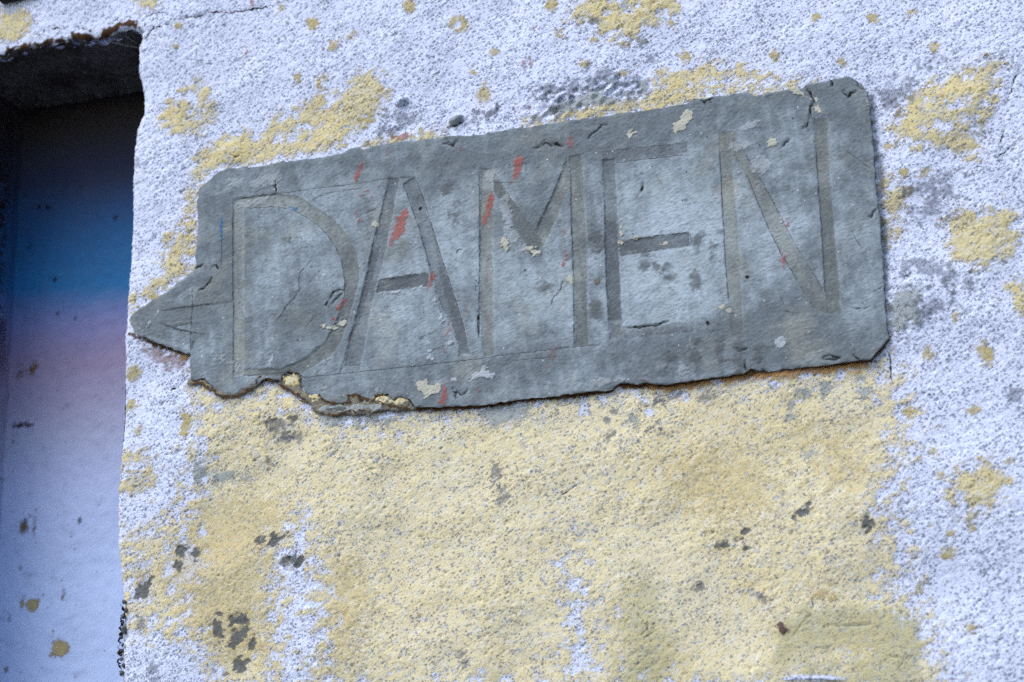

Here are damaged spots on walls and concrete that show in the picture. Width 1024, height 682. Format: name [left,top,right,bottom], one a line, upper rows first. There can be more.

flaking render [890,282,931,334]
spalling [187,373,416,430]
flaking render [469,402,533,430]
spalling [783,381,832,421]
flaking render [192,455,253,487]
spalling [172,545,201,572]
spalling [254,531,303,573]
spalling [714,527,751,550]
spalling [792,501,815,521]
spalling [861,515,877,535]
spalling [117,575,155,676]
spalling [210,611,257,676]